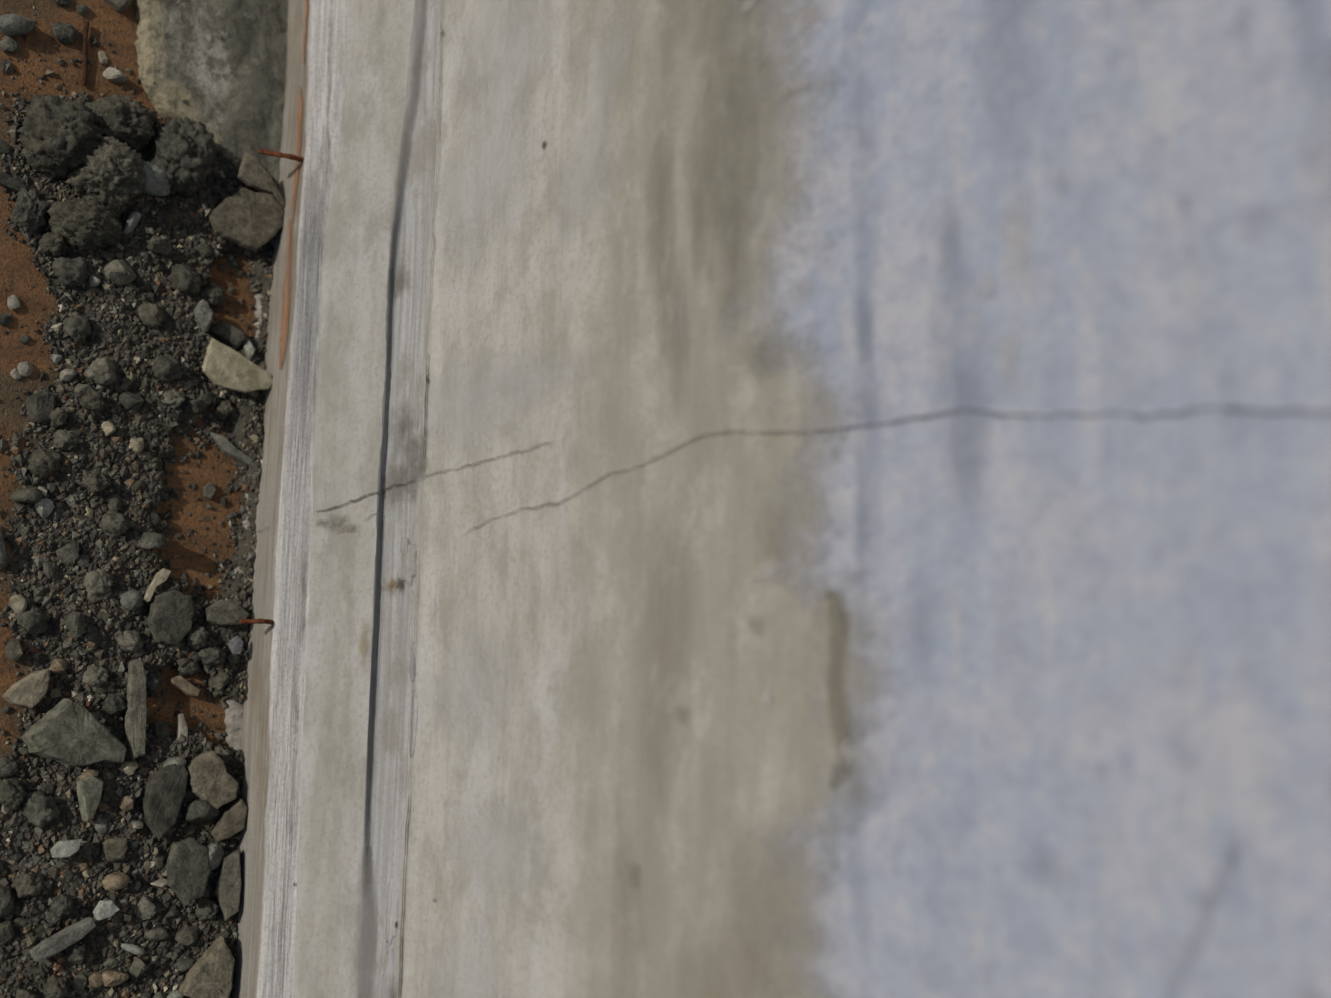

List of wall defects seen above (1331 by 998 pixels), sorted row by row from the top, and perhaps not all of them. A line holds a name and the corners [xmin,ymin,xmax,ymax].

crack [318,352,428,511]
crack [814,407,1331,432]